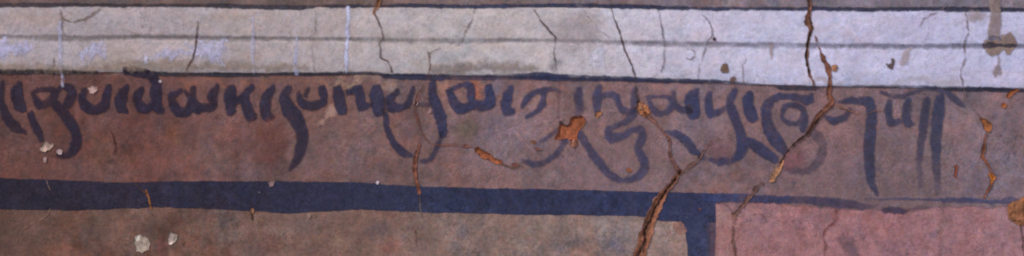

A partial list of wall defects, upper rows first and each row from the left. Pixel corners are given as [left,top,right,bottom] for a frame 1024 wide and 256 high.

crack [373,0,392,73]
spalling [475,146,519,166]
spalling [555,111,602,148]
crack [587,7,722,256]
crack [725,0,882,256]
crack [920,4,996,199]
peeling [134,234,150,253]
spalling [1007,197,1024,226]